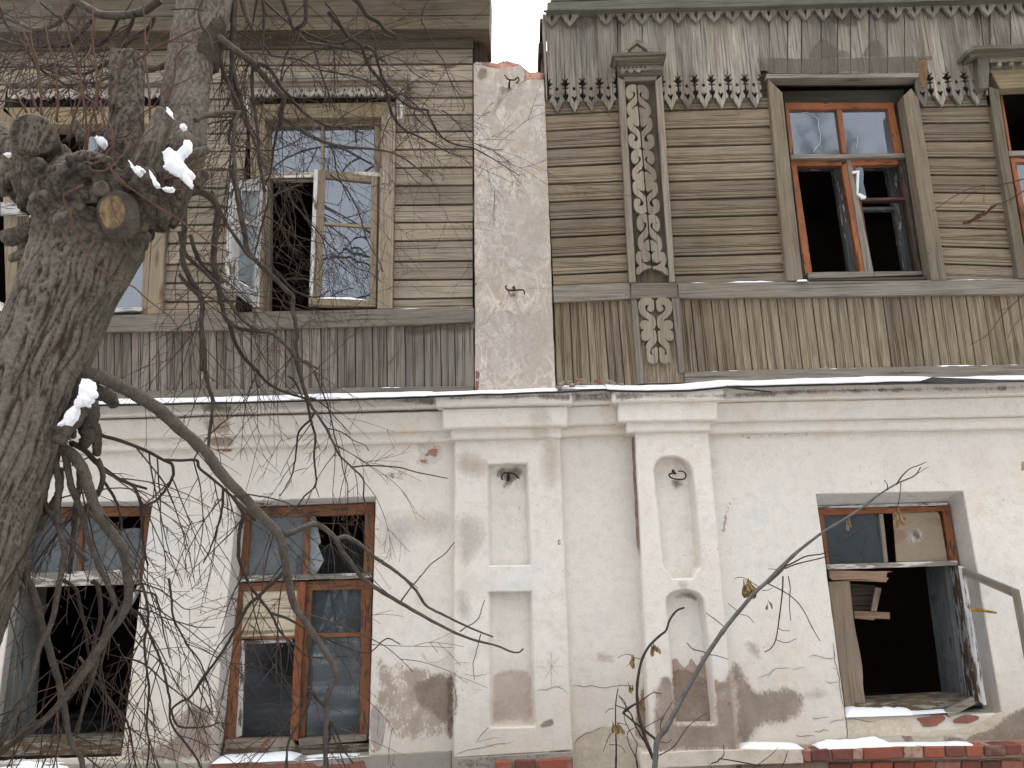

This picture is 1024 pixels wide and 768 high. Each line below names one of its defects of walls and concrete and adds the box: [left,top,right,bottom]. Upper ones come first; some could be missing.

flaking render [917,714,979,727]